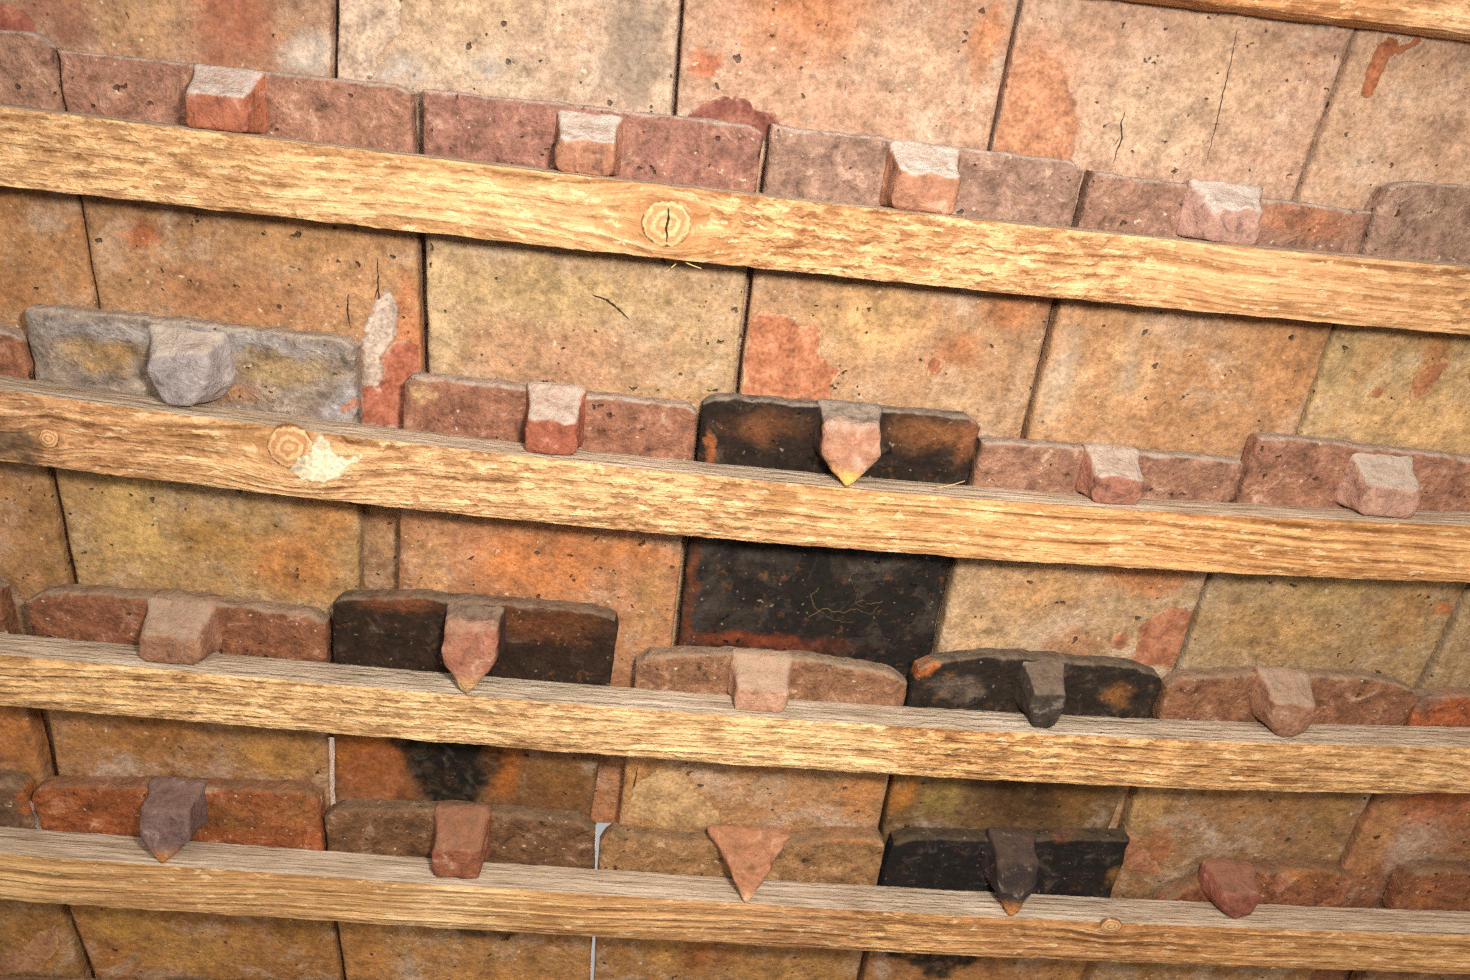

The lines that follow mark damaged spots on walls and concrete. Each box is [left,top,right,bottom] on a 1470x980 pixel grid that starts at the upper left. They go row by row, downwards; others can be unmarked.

peeling [361,290,419,428]